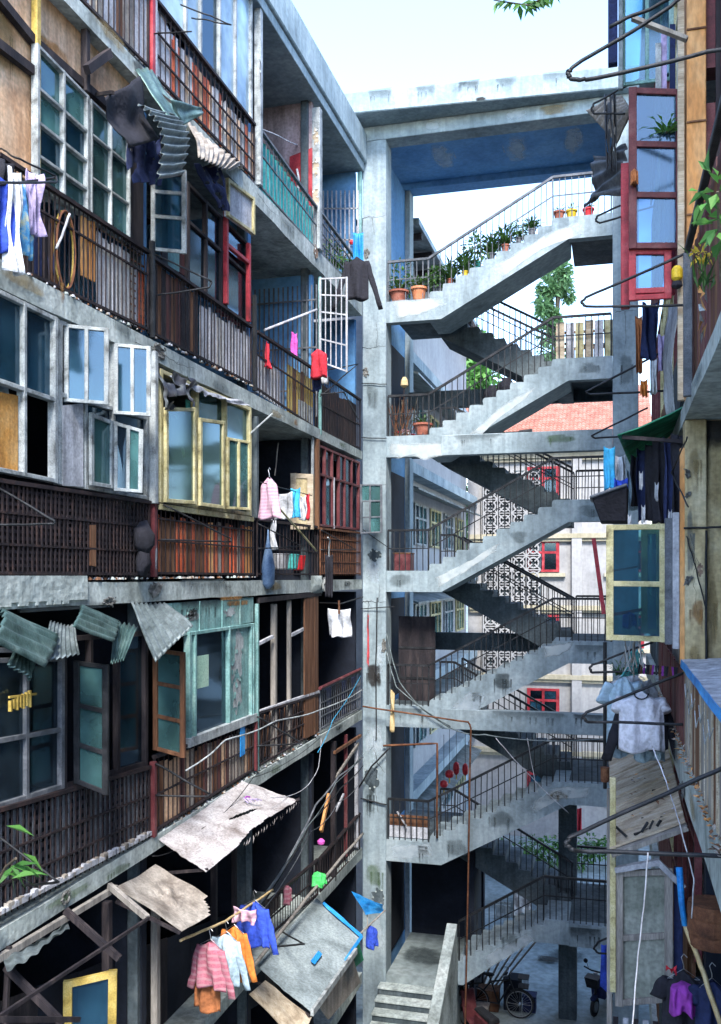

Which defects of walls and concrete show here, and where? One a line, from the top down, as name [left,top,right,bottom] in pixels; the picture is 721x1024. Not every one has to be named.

damp [406,948,439,964]